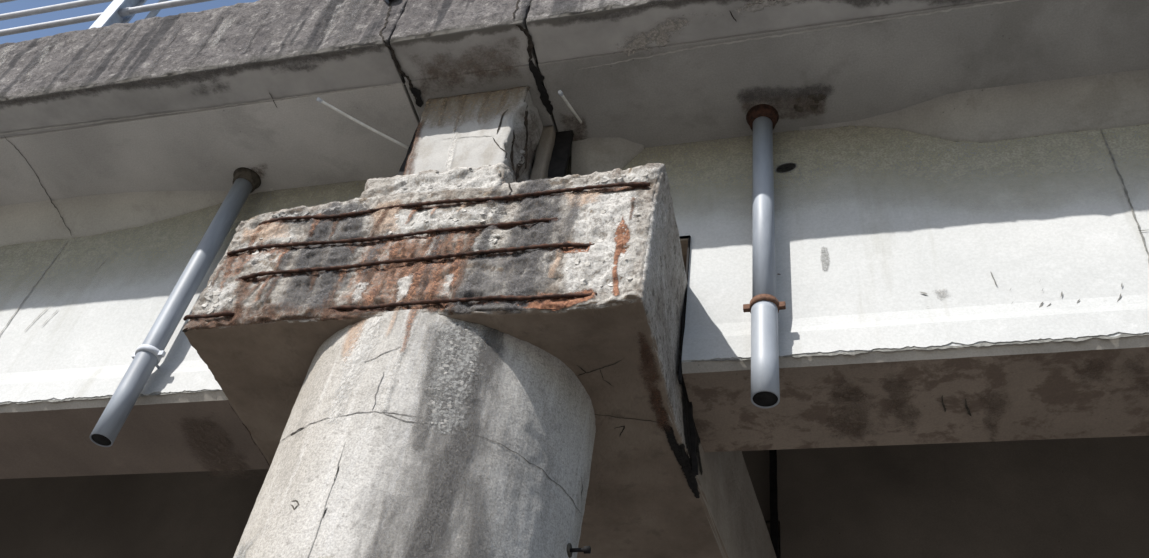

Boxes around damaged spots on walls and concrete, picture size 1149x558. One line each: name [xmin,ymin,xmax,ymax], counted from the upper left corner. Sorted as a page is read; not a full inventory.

damp [0,25,381,107]
damp [230,180,449,309]
crack [379,1,424,107]
corrosion [186,186,650,355]
spalling [183,167,661,321]
crack [447,0,553,204]
damp [621,135,753,189]
crack [1101,130,1149,262]
damp [405,116,578,558]
crack [307,444,345,558]
crack [281,342,583,512]
damp [664,390,703,498]